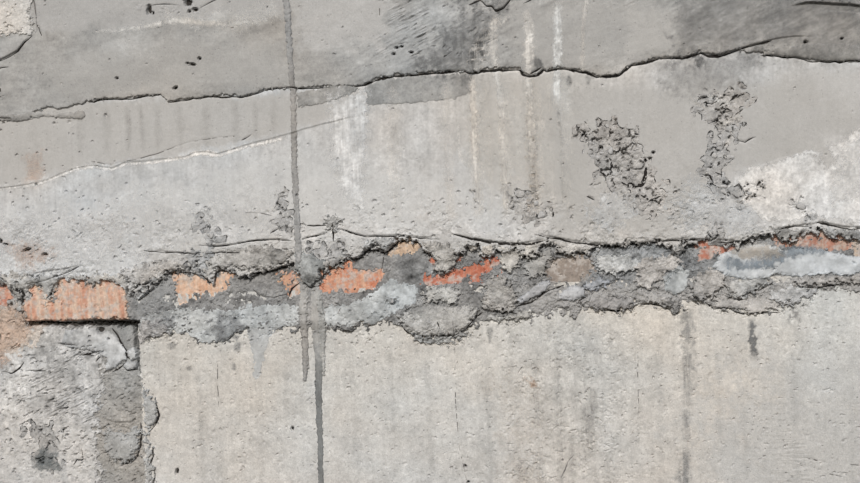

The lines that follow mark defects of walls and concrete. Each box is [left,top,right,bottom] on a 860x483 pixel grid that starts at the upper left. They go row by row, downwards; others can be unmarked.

flaking render [0,0,39,37]
crack [0,0,42,92]
crack [354,40,860,87]
crack [91,87,328,103]
spalling [571,116,677,220]
spalling [691,82,757,210]
spalling [180,204,226,278]
spalling [306,238,354,267]
spalling [706,222,727,246]
spalling [7,280,32,325]